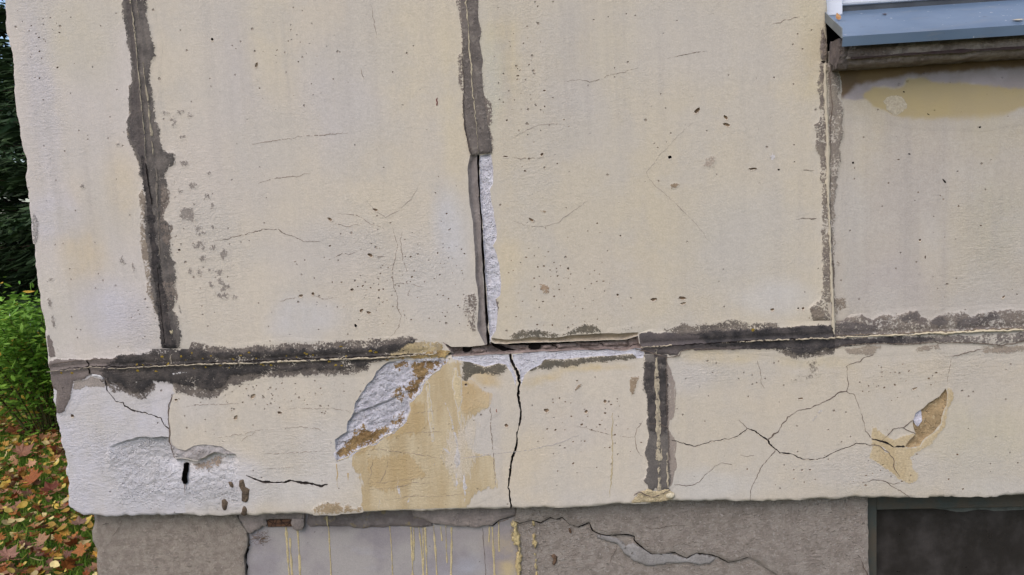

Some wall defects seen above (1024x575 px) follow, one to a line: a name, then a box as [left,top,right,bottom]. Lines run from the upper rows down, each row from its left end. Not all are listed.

damp [839,59,1024,132]
damp [176,170,239,301]
peeling [334,0,683,503]
crack [104,379,175,458]
spalling [103,436,250,513]
damp [48,331,508,511]
crack [223,156,748,575]
damp [508,317,837,385]
crack [584,340,1024,497]
spalling [871,389,947,477]